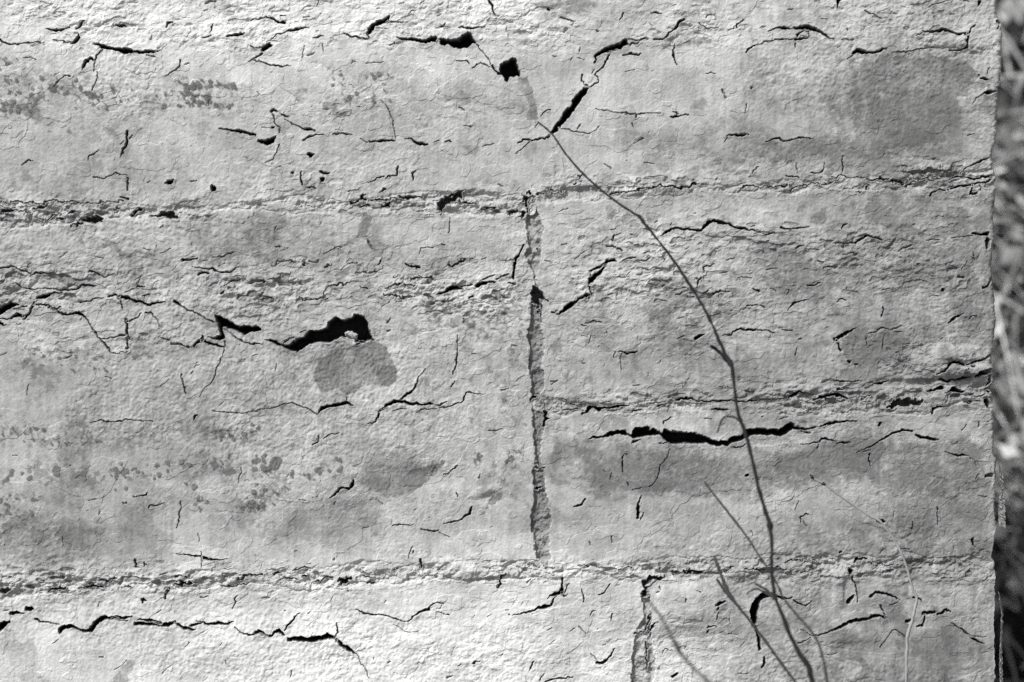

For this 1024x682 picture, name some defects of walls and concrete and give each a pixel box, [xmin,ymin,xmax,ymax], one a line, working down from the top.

crack [202,0,496,68]
crack [515,0,1000,154]
crack [551,219,883,341]
crack [0,251,483,445]
crack [560,354,995,520]
crack [0,595,450,679]
crack [706,556,994,668]